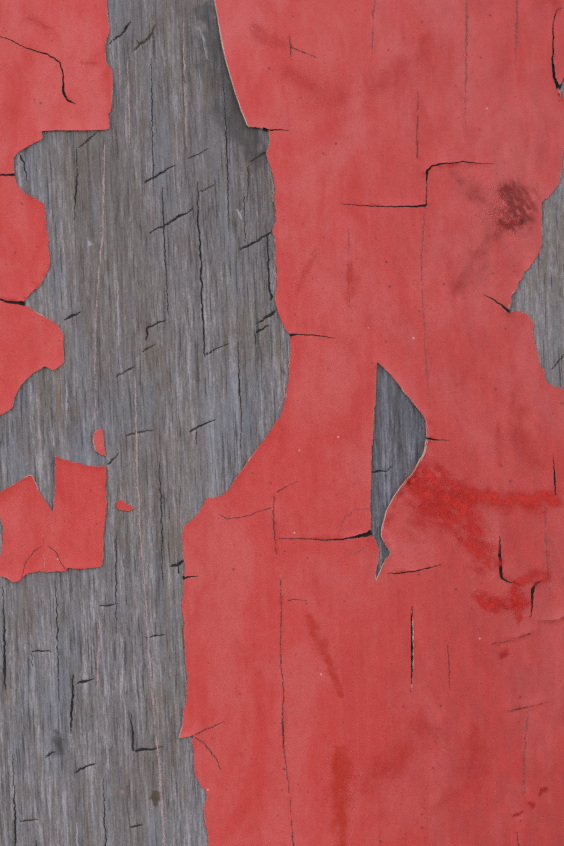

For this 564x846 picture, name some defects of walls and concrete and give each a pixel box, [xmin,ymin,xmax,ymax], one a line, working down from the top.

crack [0,36,75,104]
peeling [0,0,113,415]
crack [344,92,489,405]
crack [0,586,8,689]
crack [21,546,95,734]
peeling [0,456,134,583]
peeling [92,429,106,456]
crack [280,579,307,846]
crack [219,481,372,555]
peeling [179,0,564,846]
crack [408,606,416,693]
crack [492,458,563,645]